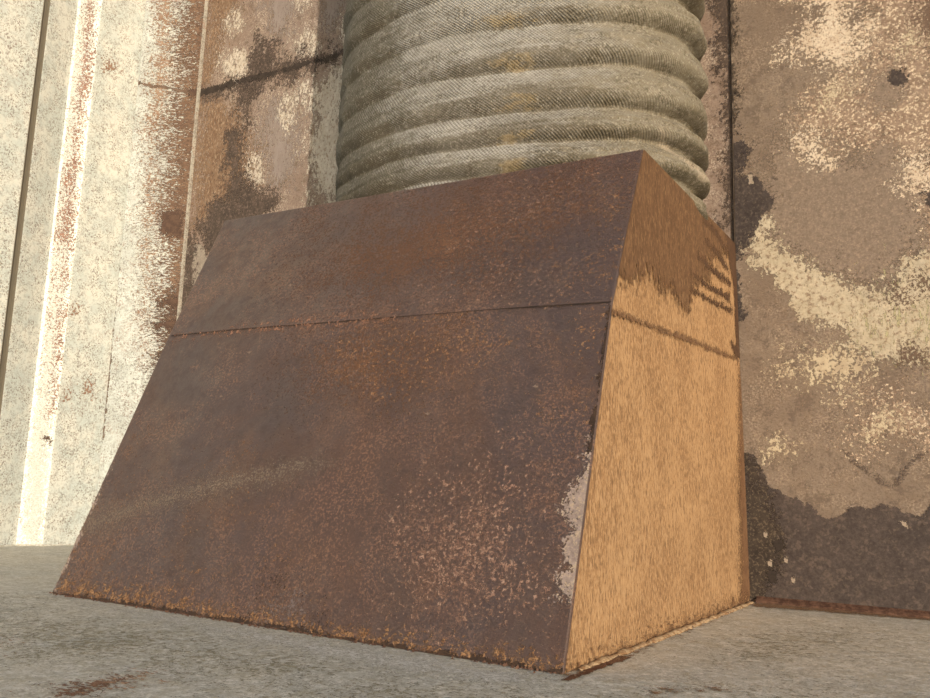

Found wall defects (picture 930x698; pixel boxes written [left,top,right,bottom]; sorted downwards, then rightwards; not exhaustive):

crack [138,80,197,99]
rust [127,0,273,393]
water stain [193,0,347,256]
rust [771,0,930,261]
rust [53,156,930,677]
water stain [744,450,930,611]
rust [34,668,176,698]
rust [640,685,733,697]